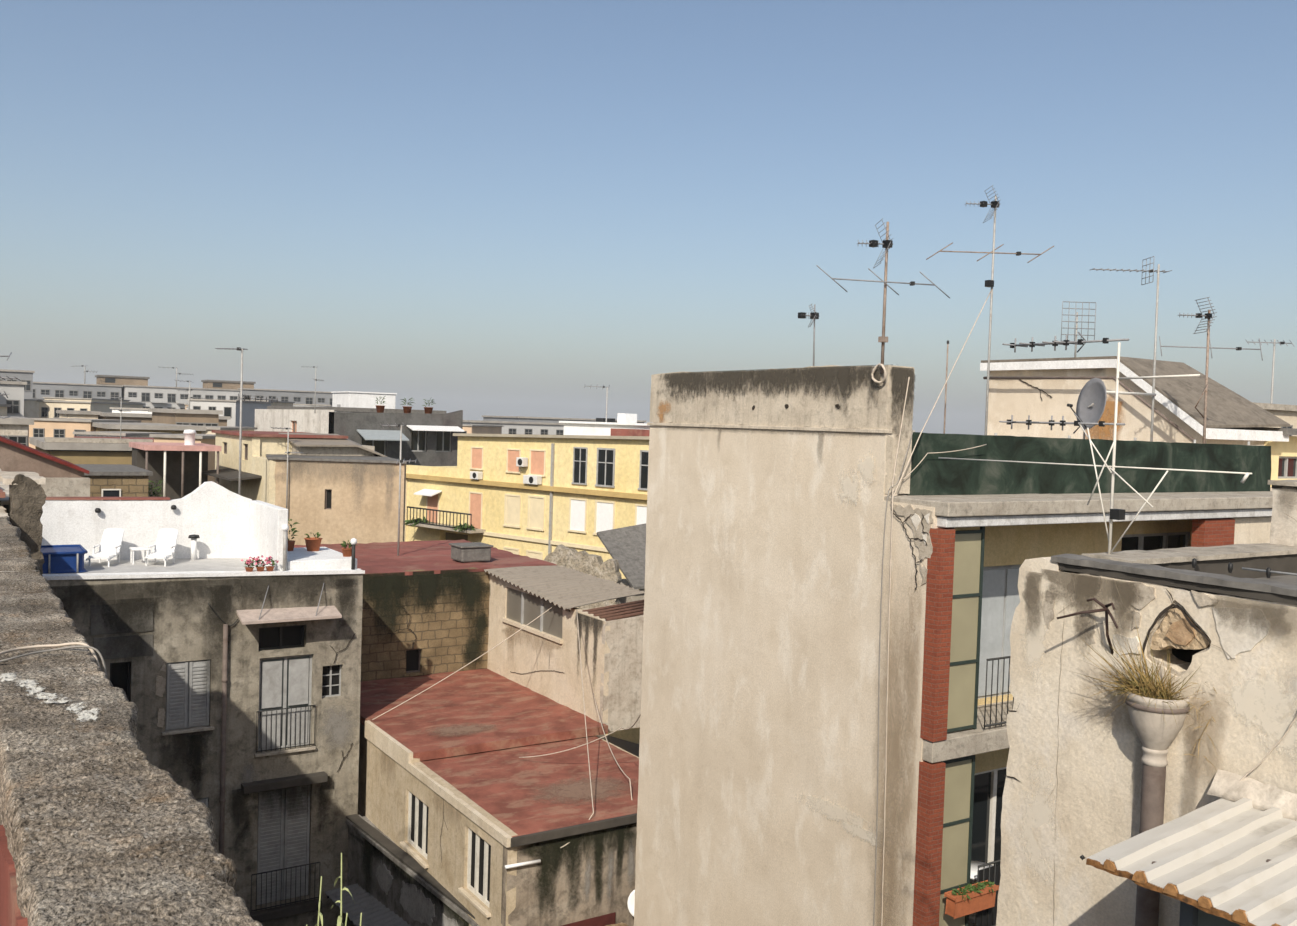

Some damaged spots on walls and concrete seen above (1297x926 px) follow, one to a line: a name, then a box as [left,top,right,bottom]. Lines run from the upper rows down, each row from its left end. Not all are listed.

damp [664,364,915,436]
peeling [890,504,933,585]
damp [51,569,490,666]
peeling [1022,576,1074,629]
spalling [1113,582,1271,676]
crack [1004,579,1136,825]